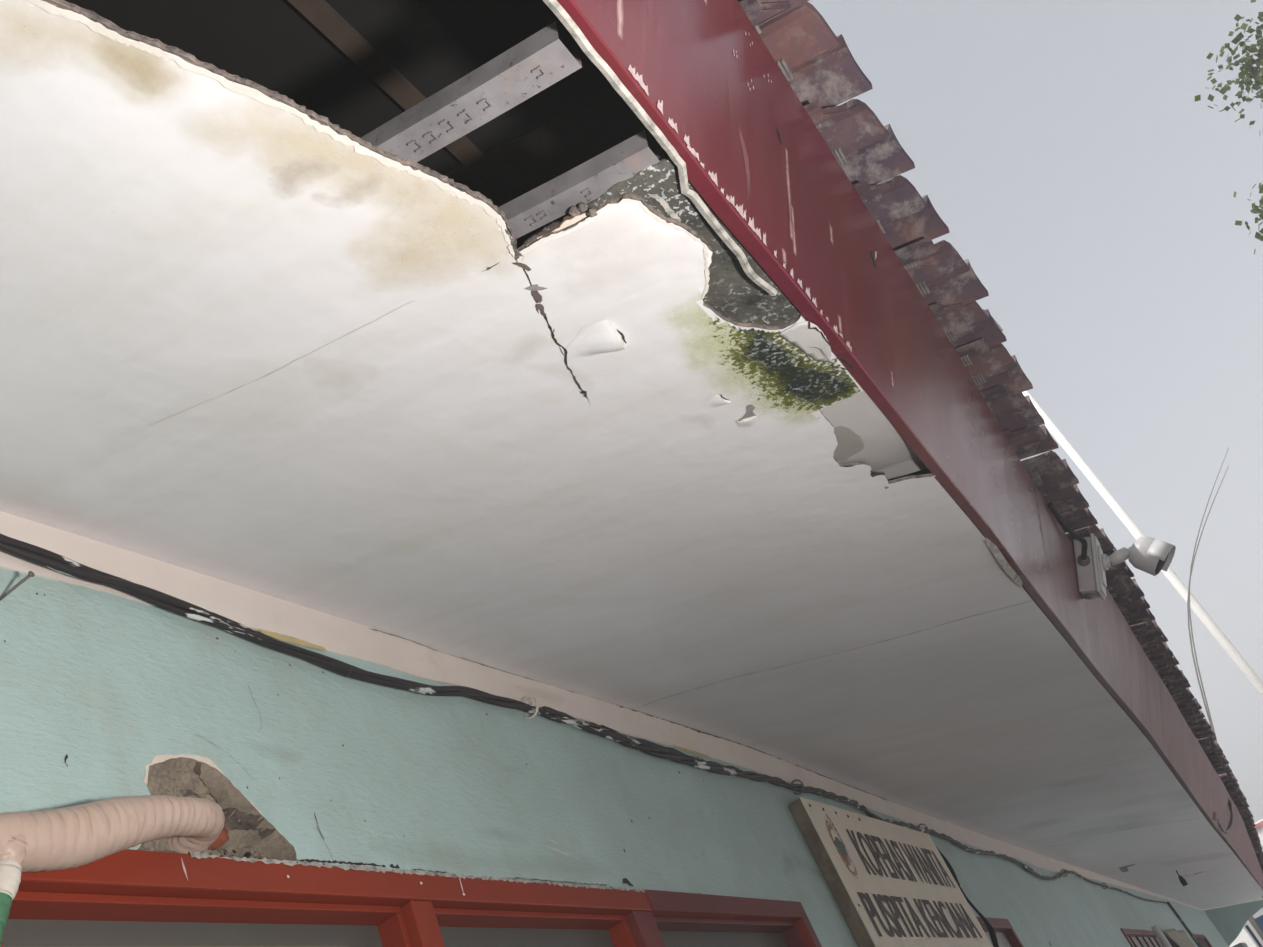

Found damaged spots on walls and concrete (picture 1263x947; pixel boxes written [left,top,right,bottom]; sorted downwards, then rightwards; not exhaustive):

spalling [26,0,855,370]
crack [482,262,591,406]
peeling [820,391,927,489]
flaking render [137,754,297,861]